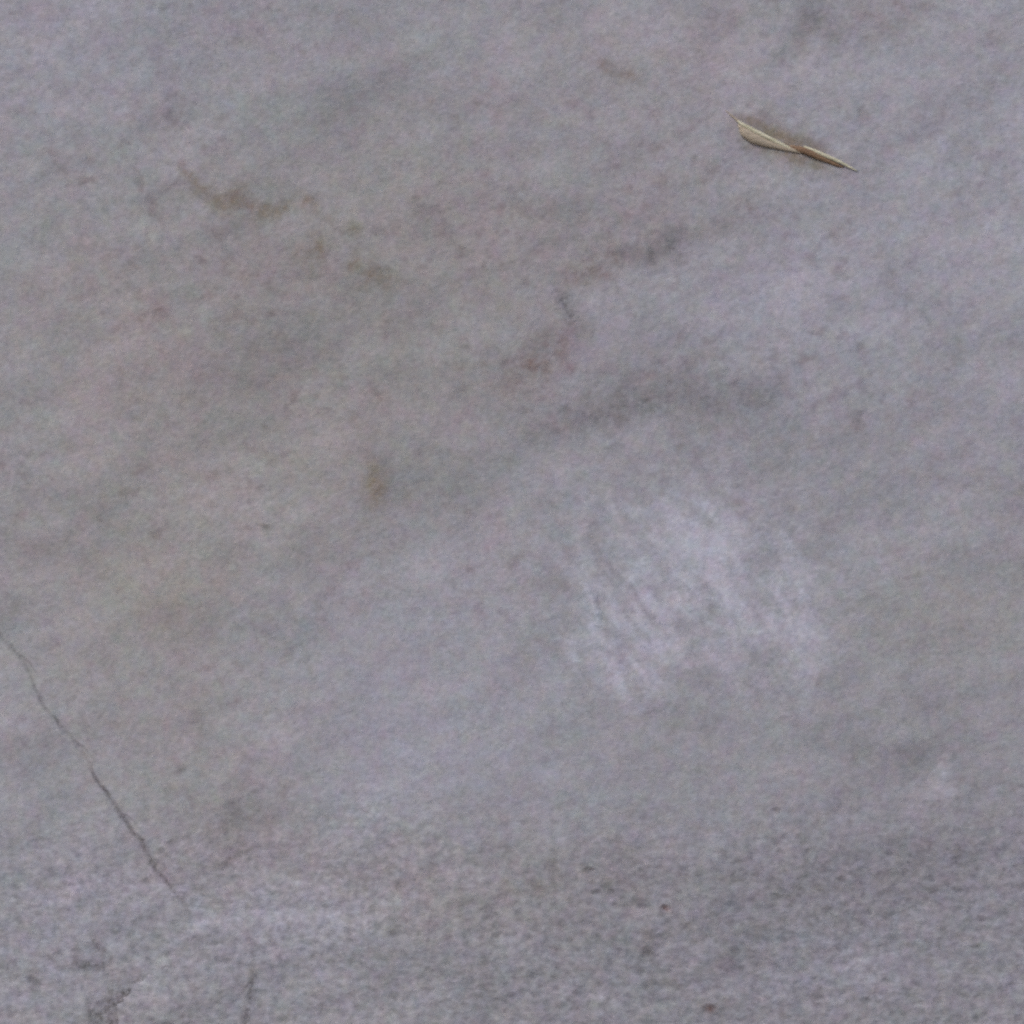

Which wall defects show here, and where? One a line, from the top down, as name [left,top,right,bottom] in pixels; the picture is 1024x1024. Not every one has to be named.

crack [0,630,193,914]